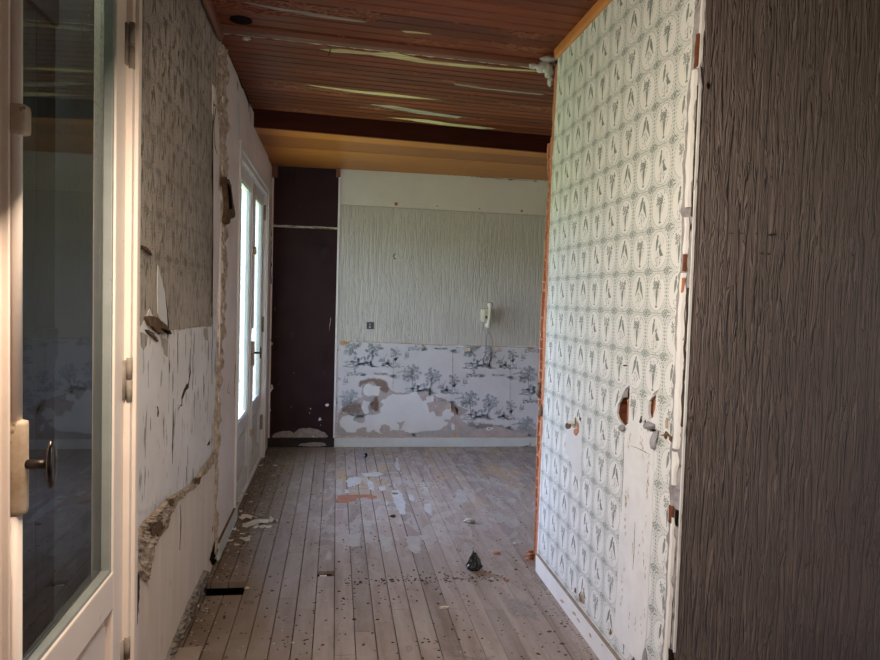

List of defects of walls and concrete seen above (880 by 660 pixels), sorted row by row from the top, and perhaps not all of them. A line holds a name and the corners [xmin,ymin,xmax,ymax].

peeling [272,408,328,447]
peeling [340,383,381,417]
spalling [639,389,660,450]
flaking render [138,450,218,581]